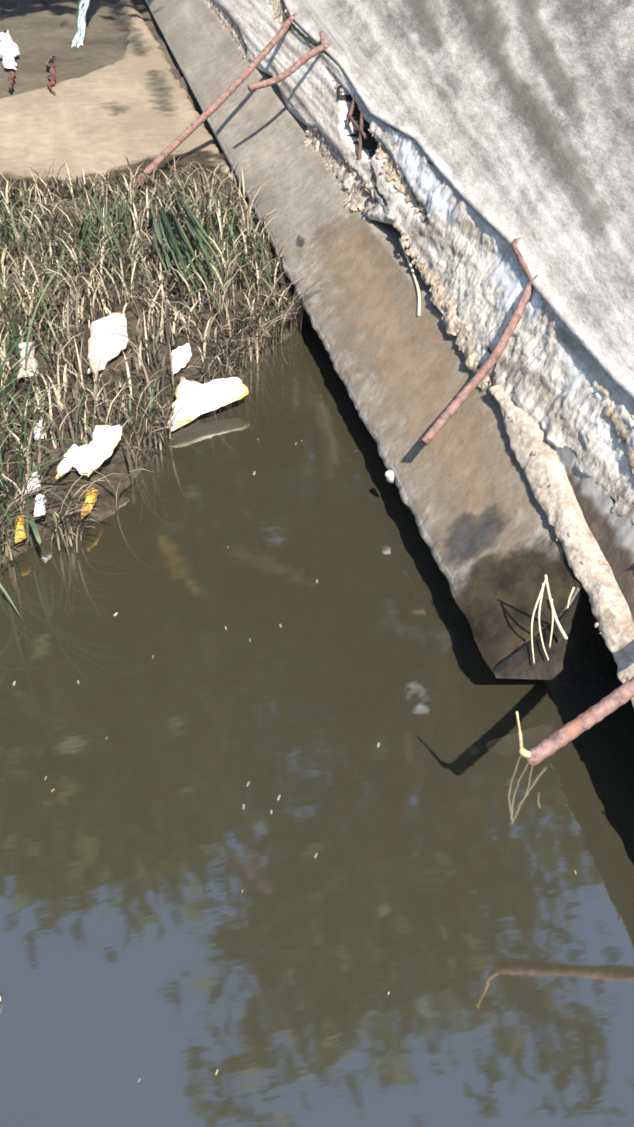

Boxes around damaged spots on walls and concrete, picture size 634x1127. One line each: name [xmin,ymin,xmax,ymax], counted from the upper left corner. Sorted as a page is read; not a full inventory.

spalling [204,0,247,59]
spalling [269,0,291,30]
spalling [304,127,377,213]
spalling [368,128,426,221]
spalling [393,221,491,390]
spalling [598,386,634,475]